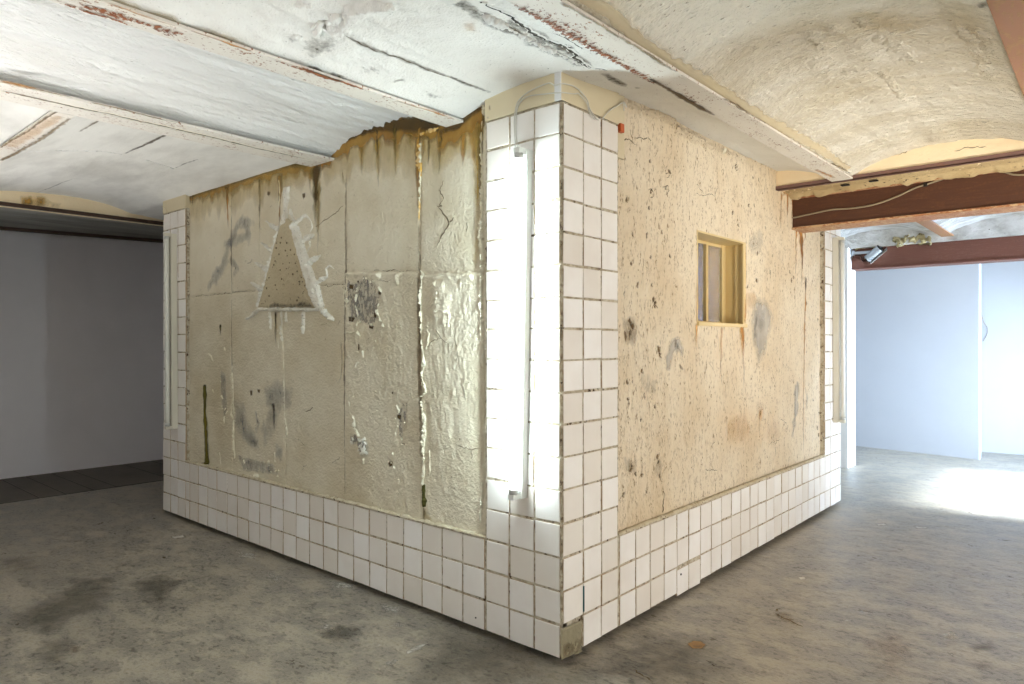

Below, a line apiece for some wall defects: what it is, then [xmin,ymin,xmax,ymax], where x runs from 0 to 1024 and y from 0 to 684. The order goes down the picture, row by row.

corrosion [65,4,183,36]
crack [480,1,608,71]
corrosion [515,3,714,115]
water stain [415,127,438,219]
crack [437,181,468,246]
spalling [345,272,384,368]
spalling [348,402,368,464]